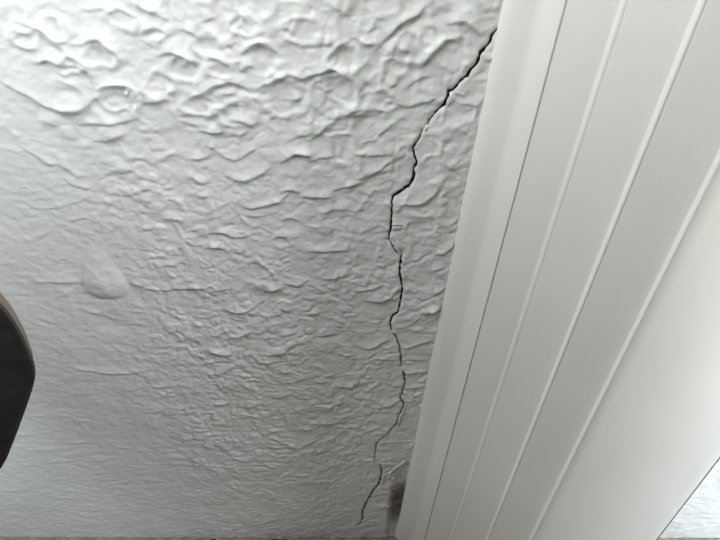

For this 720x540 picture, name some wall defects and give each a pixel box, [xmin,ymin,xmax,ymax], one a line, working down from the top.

crack [358,29,497,525]